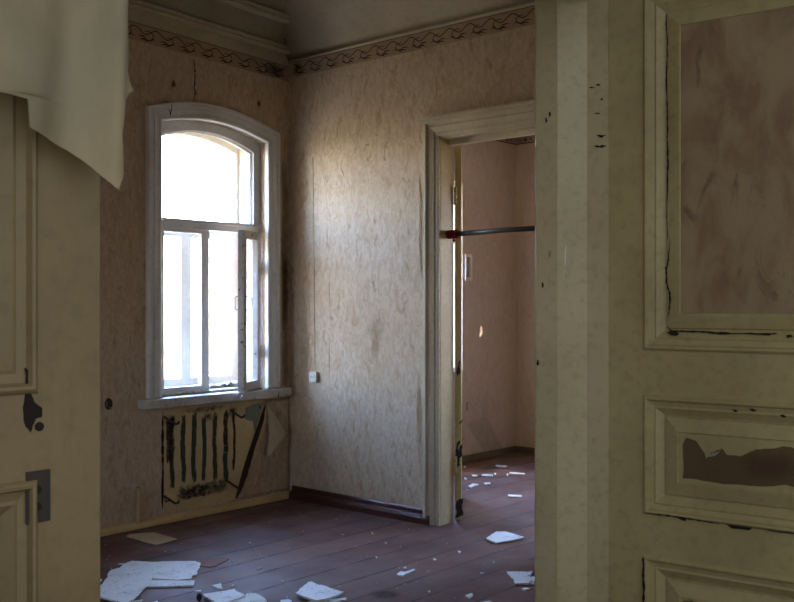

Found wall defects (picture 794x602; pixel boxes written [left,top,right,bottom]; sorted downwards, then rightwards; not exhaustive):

peeling [162,399,263,513]
peeling [683,438,794,487]